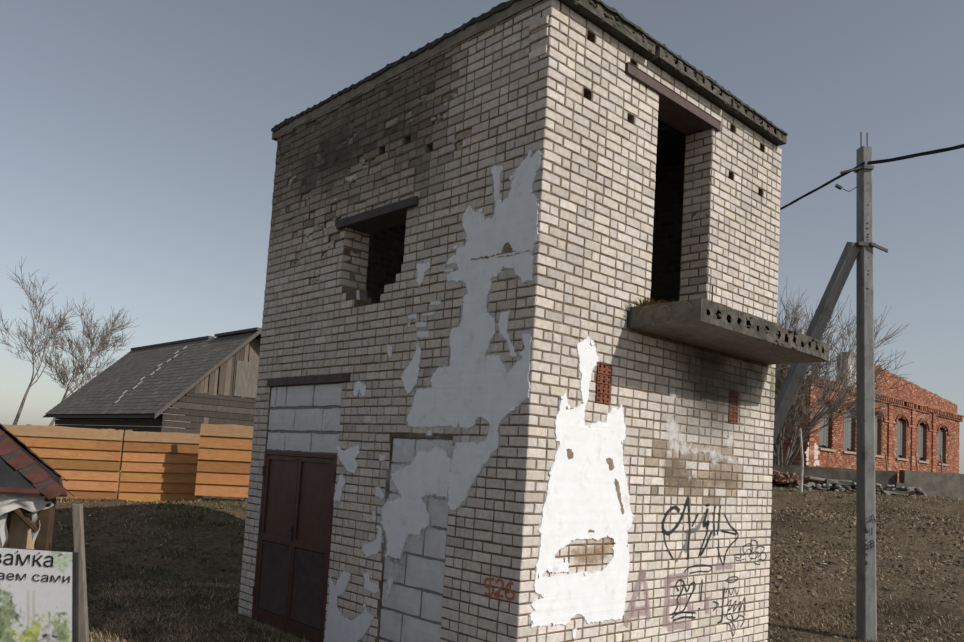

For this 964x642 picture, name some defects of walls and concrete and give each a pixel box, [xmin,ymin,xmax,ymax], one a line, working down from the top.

flaking render [353,381,366,396]
flaking render [362,150,541,559]
flaking render [334,445,360,501]
flaking render [529,336,635,628]
flaking render [324,571,374,642]
flaking render [363,572,379,594]